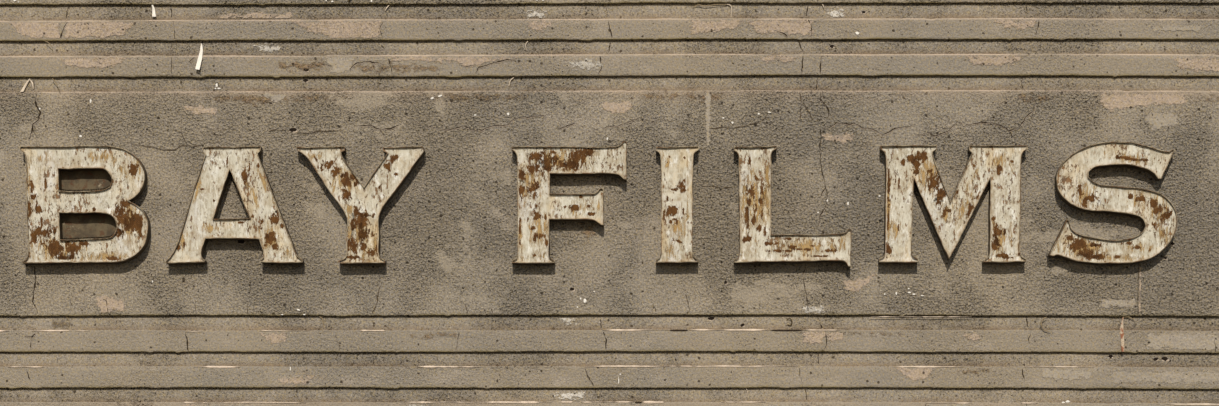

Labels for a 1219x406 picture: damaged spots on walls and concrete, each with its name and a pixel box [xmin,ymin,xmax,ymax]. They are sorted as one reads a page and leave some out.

crack [29,82,41,141]
crack [170,0,193,76]
crack [321,7,392,71]
crack [270,115,661,138]
crack [461,59,515,72]
crack [774,0,1036,224]
corrosion [27,152,145,261]
corrosion [308,153,378,262]
corrosion [518,147,600,260]
corrosion [740,157,845,257]
corrosion [886,149,979,259]
corrosion [1054,188,1173,262]